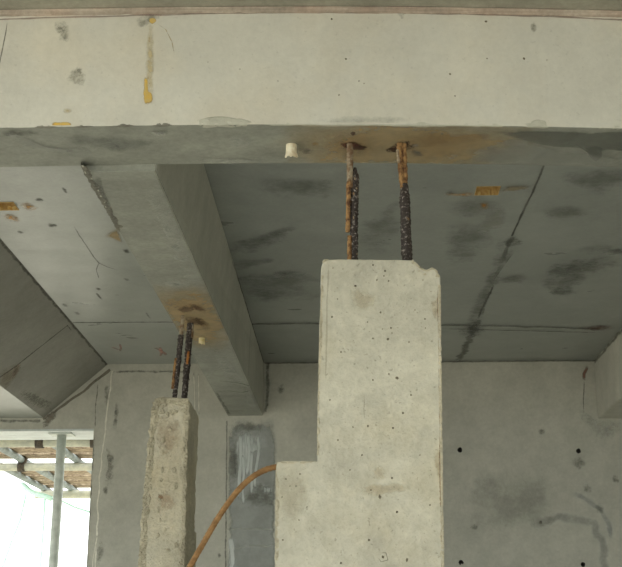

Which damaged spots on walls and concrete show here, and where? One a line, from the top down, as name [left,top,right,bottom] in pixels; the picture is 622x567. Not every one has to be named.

corrosion [322,126,503,164]
spalling [81,162,123,232]
crack [500,166,544,263]
corrosion [165,294,223,342]
crack [0,239,173,567]
water stain [228,424,275,567]